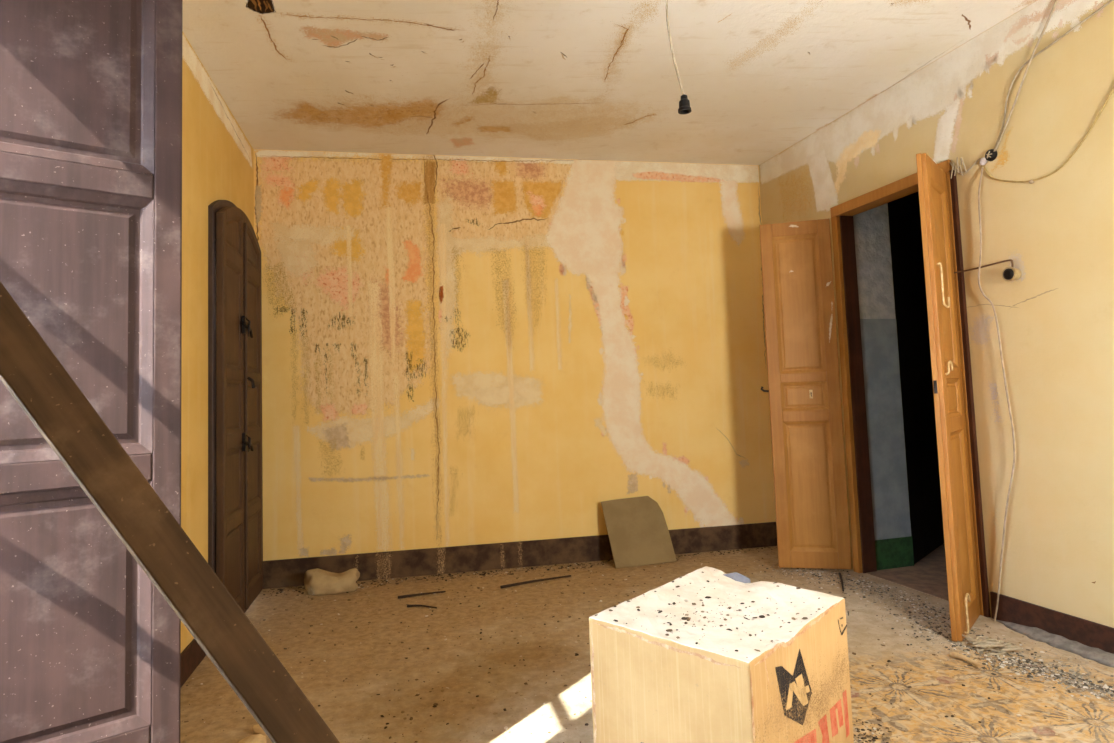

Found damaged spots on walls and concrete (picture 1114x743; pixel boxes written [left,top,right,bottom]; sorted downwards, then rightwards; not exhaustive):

crack [255,9,468,62]
water stain [267,0,668,148]
crack [414,24,631,134]
peeling [614,0,1109,185]
peeling [182,35,575,419]
water stain [262,155,476,580]
water stain [487,236,572,513]